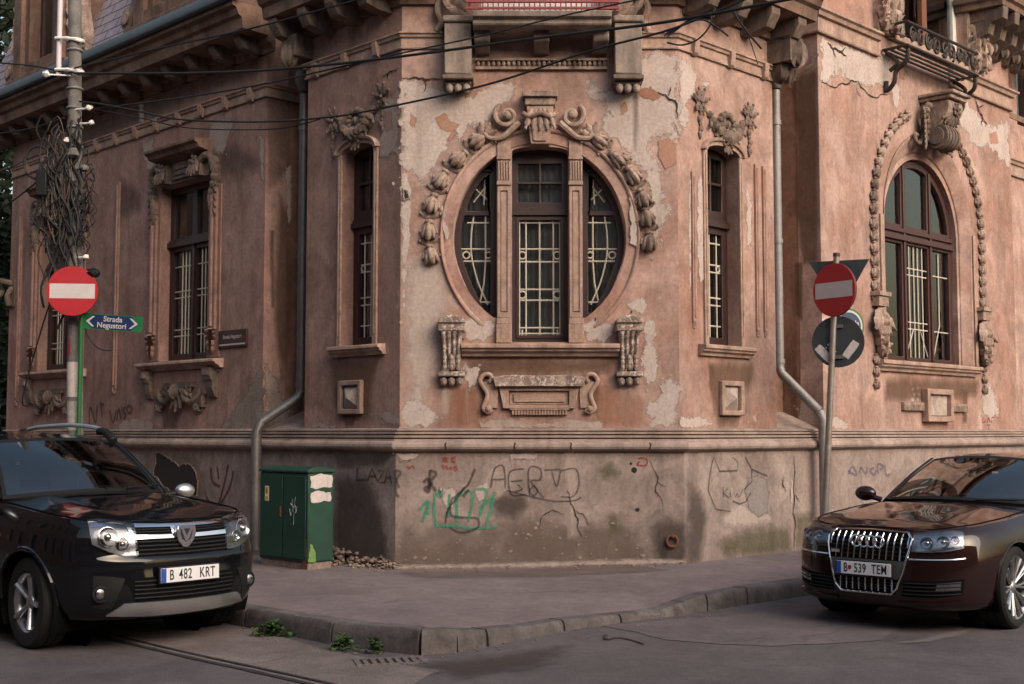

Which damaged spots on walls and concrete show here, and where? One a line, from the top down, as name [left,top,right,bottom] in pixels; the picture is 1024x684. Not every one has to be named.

peeling [789,35,905,112]
crack [823,42,890,98]
peeling [575,49,710,247]
peeling [960,102,1010,168]
peeling [392,79,517,324]
peeling [623,297,712,428]
peeling [399,396,442,428]
crack [649,443,666,506]
crack [537,491,589,538]